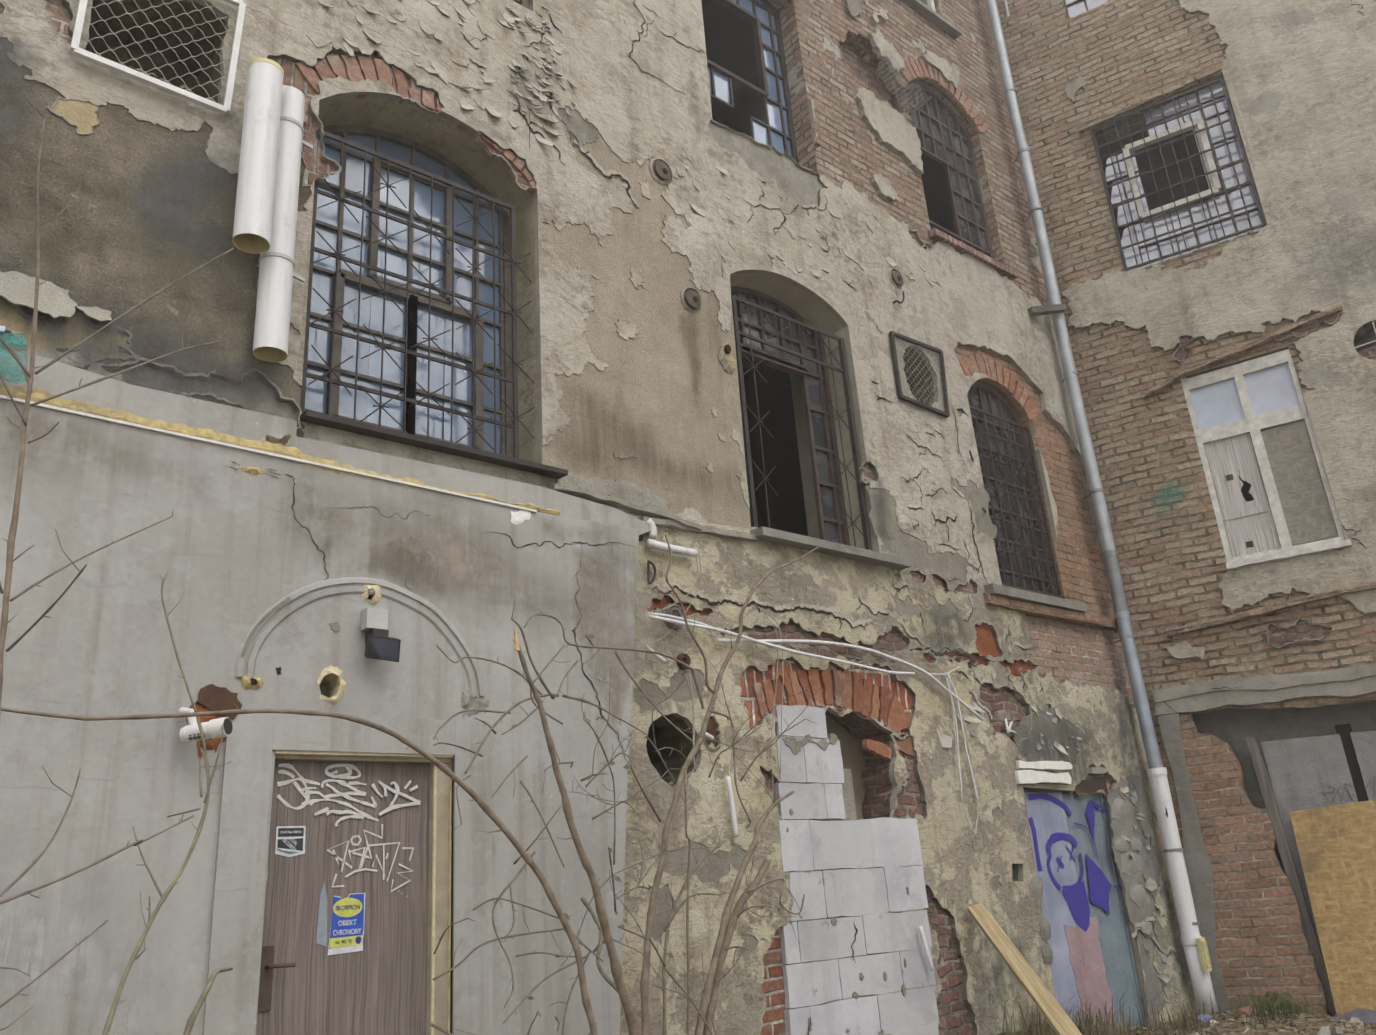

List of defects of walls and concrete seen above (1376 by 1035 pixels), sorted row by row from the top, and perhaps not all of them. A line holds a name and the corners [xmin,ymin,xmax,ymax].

spalling [43,0,76,53]
peeling [845,0,864,16]
peeling [47,96,100,134]
peeling [639,148,747,301]
spalling [707,118,935,286]
crack [287,474,441,580]
crack [870,378,987,621]
crack [478,532,634,774]
peeling [633,668,721,753]
crack [643,580,927,648]
spalling [648,462,1179,1035]
crack [954,623,1062,720]